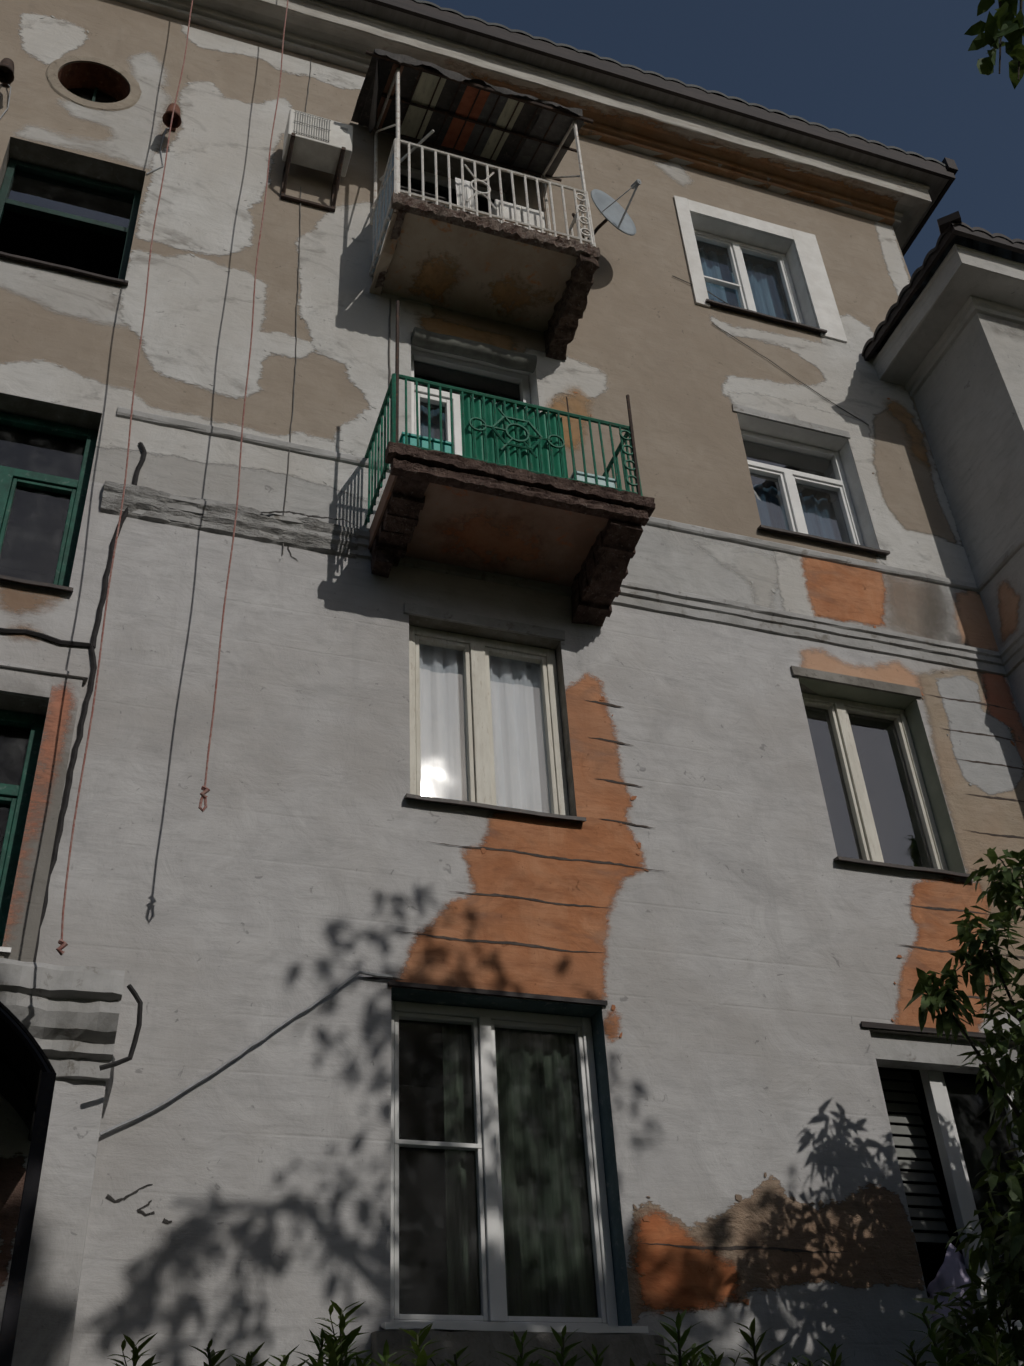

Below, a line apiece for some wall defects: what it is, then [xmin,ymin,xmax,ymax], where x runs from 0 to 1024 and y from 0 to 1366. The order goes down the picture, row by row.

spalling [100,481,359,559]
peeling [802,557,886,628]
peeling [872,398,957,544]
peeling [955,582,1020,651]
peeling [395,674,648,1041]
peeling [801,649,1024,1034]
spalling [0,1152,27,1286]
spalling [627,1172,925,1324]